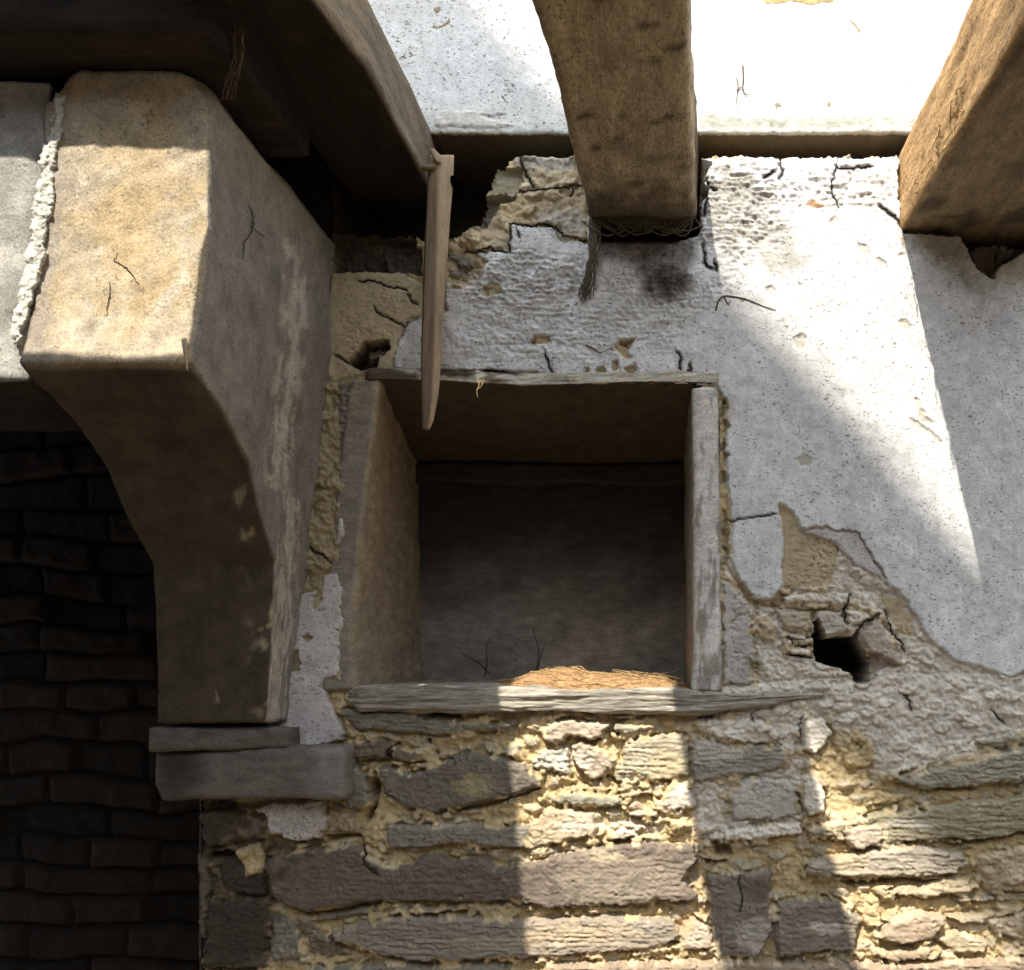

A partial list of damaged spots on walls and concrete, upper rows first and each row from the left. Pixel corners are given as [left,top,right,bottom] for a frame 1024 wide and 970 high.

crack [106,252,137,316]
flaking render [481,280,502,297]
flaking render [456,156,589,254]
crack [464,160,587,254]
crack [698,180,718,271]
crack [831,157,874,209]
flaking render [968,245,1024,280]
flaking render [720,397,730,483]
peeling [263,574,346,745]
crack [786,636,813,658]
flaking render [721,506,1024,698]
crack [842,594,905,653]